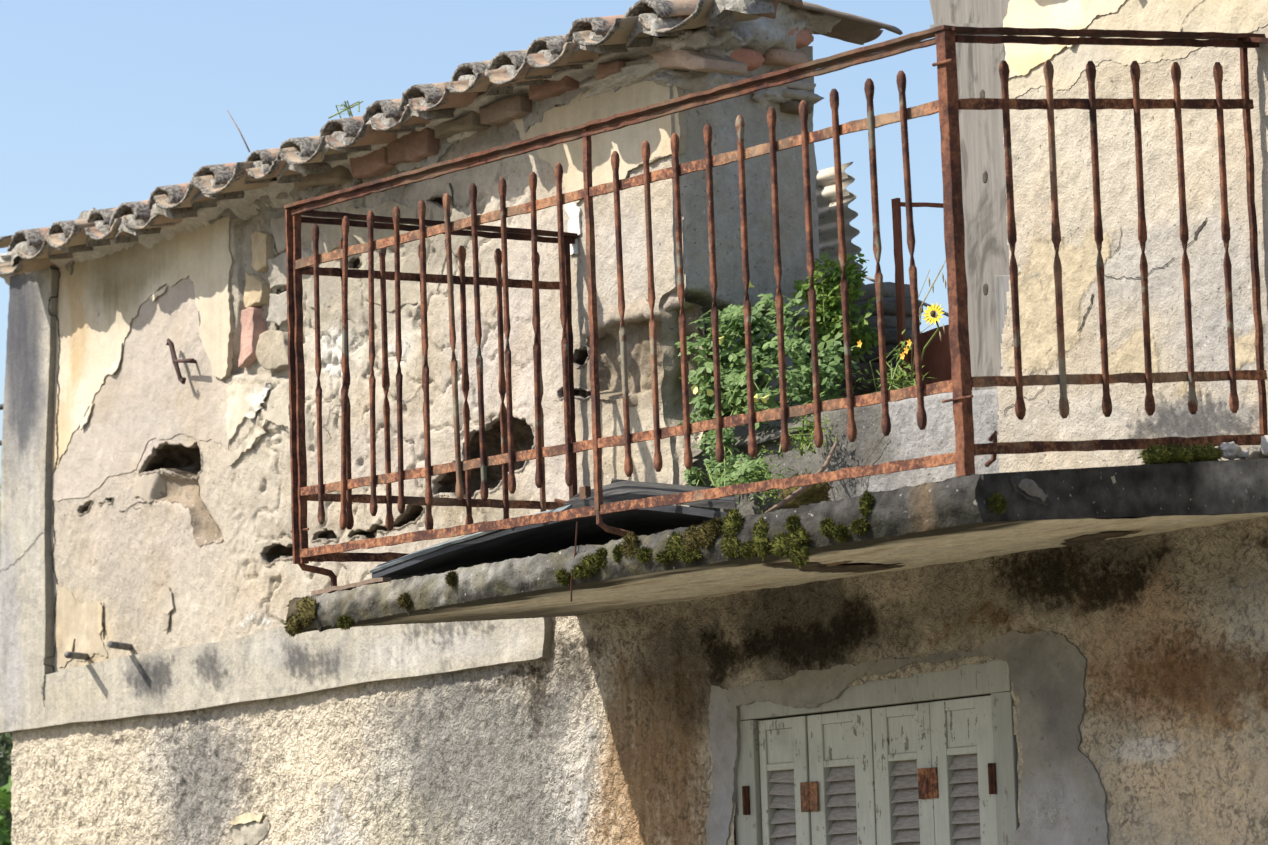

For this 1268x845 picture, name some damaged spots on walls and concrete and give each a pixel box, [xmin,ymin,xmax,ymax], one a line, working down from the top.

flaking render [1008,0,1268,99]
flaking render [52,277,290,516]
rust [906,324,952,385]
flaking render [54,584,108,667]
damp [571,724,601,828]